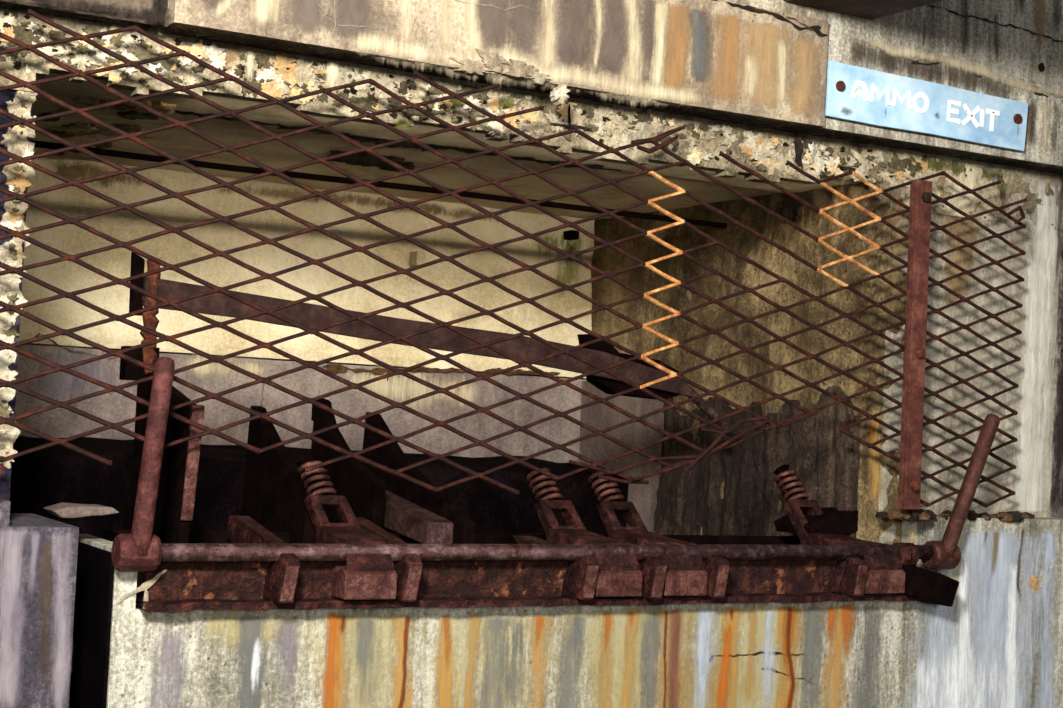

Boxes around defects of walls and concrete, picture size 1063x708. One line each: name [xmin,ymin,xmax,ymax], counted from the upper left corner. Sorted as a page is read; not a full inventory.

crack [715,0,828,37]
crack [929,5,1063,42]
spalling [0,11,934,191]
spalling [0,90,177,469]
damp [0,529,70,708]
corrosion [208,615,243,640]
corrosion [324,613,412,708]
corrosion [438,616,549,708]
corrosion [587,610,644,708]
corrosion [659,611,688,708]
corrosion [706,607,800,708]
corrosion [825,605,855,708]